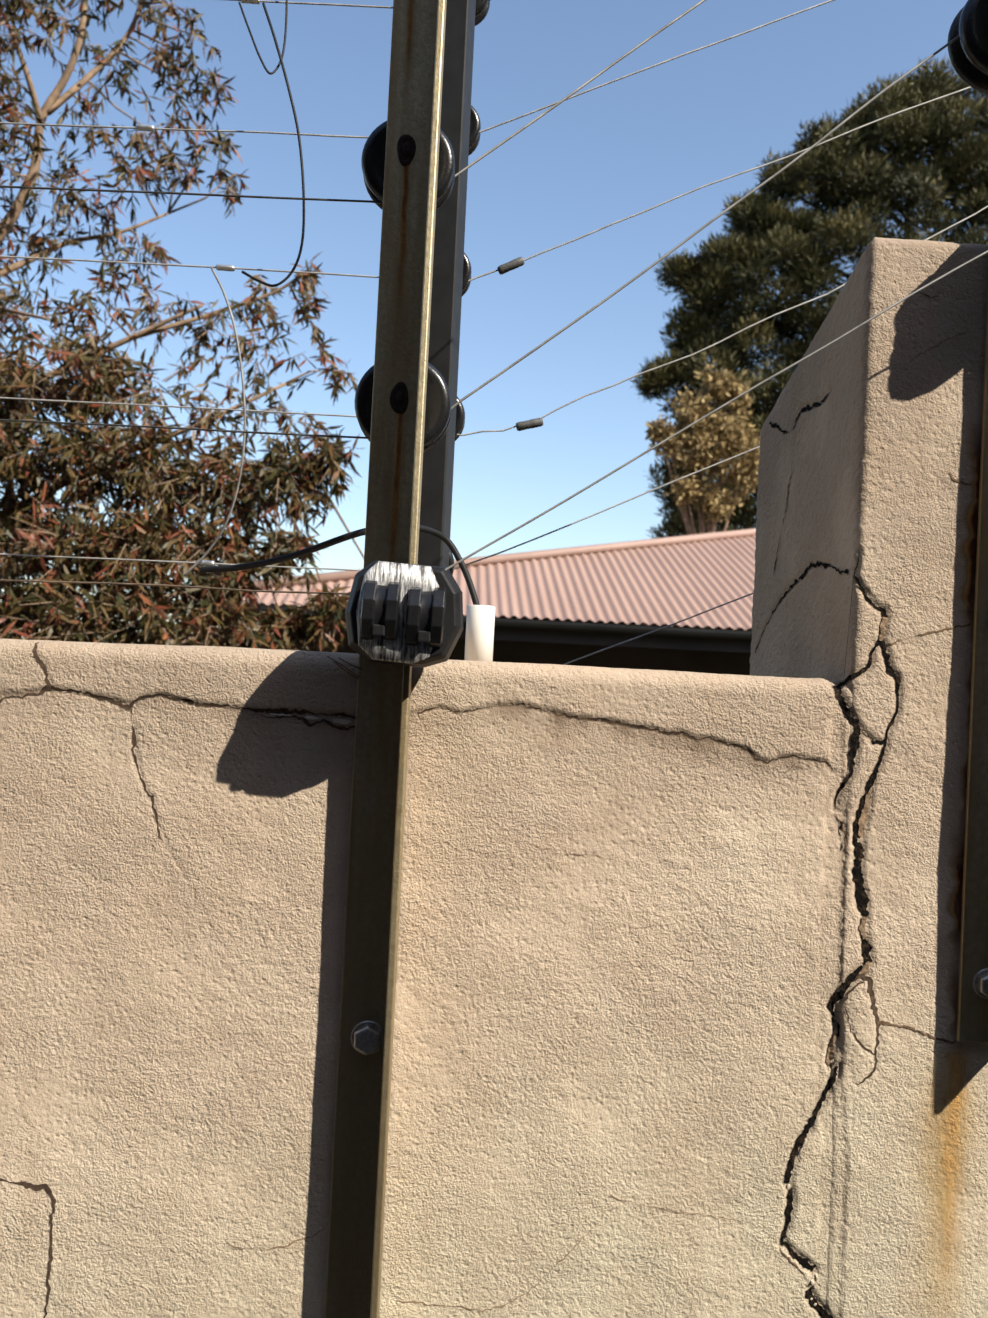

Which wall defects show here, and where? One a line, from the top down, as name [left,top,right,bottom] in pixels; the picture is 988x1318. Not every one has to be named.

crack [0,642,356,878]
crack [396,449,972,1318]
crack [0,1178,56,1318]
rust [945,1054,964,1207]